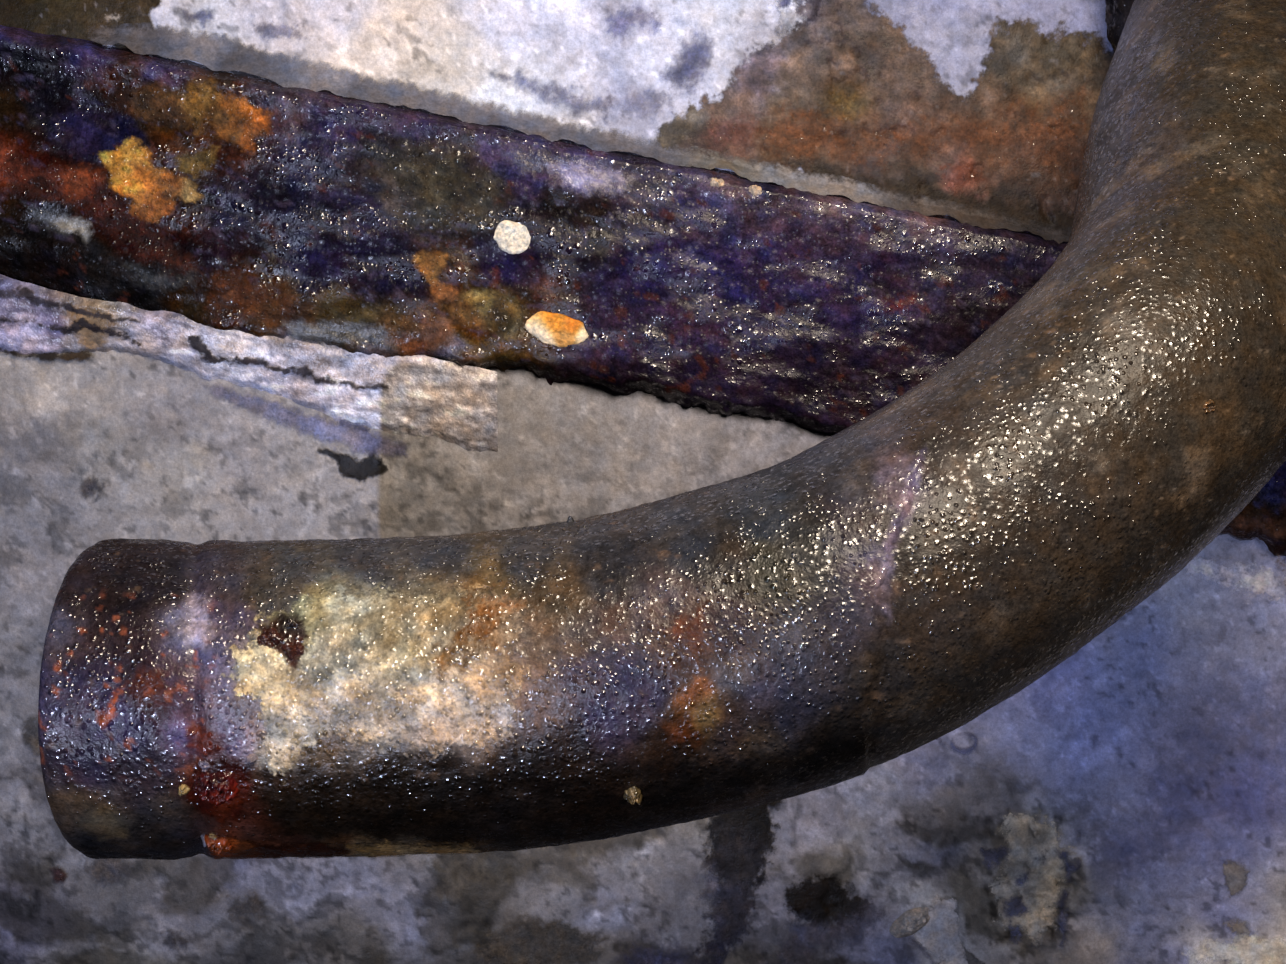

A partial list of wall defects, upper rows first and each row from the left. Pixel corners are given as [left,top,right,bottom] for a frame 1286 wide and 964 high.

corrosion [657,0,1114,234]
corrosion [0,79,528,346]
corrosion [1219,515,1286,542]
corrosion [259,613,309,668]
corrosion [432,595,522,681]
corrosion [100,698,116,726]
corrosion [663,682,716,745]
corrosion [186,723,349,859]
damp [625,800,781,964]